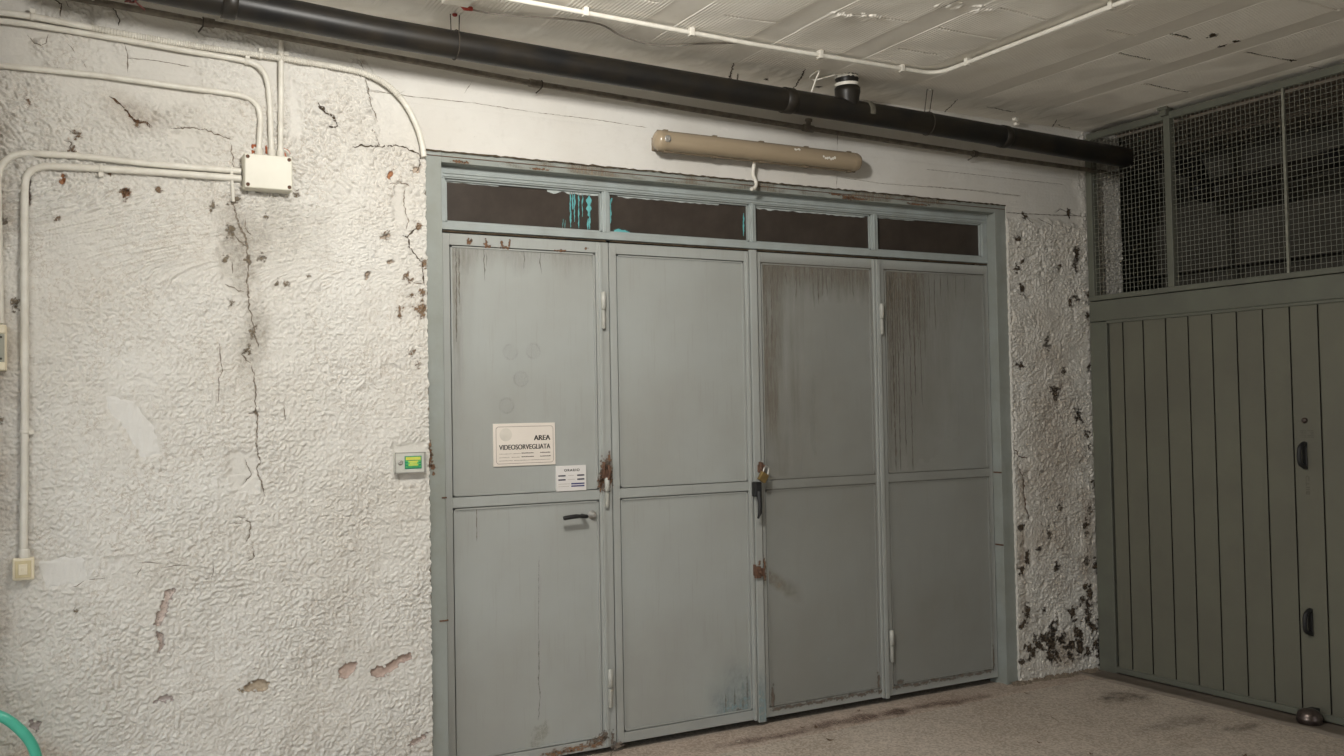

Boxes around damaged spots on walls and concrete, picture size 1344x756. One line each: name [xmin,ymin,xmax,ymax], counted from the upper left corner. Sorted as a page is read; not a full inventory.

crack [218,203,286,492]
rust [597,451,613,492]
flaking render [154,588,175,653]
flaking render [237,679,270,694]
flaking render [338,652,412,680]
rust [542,729,624,756]